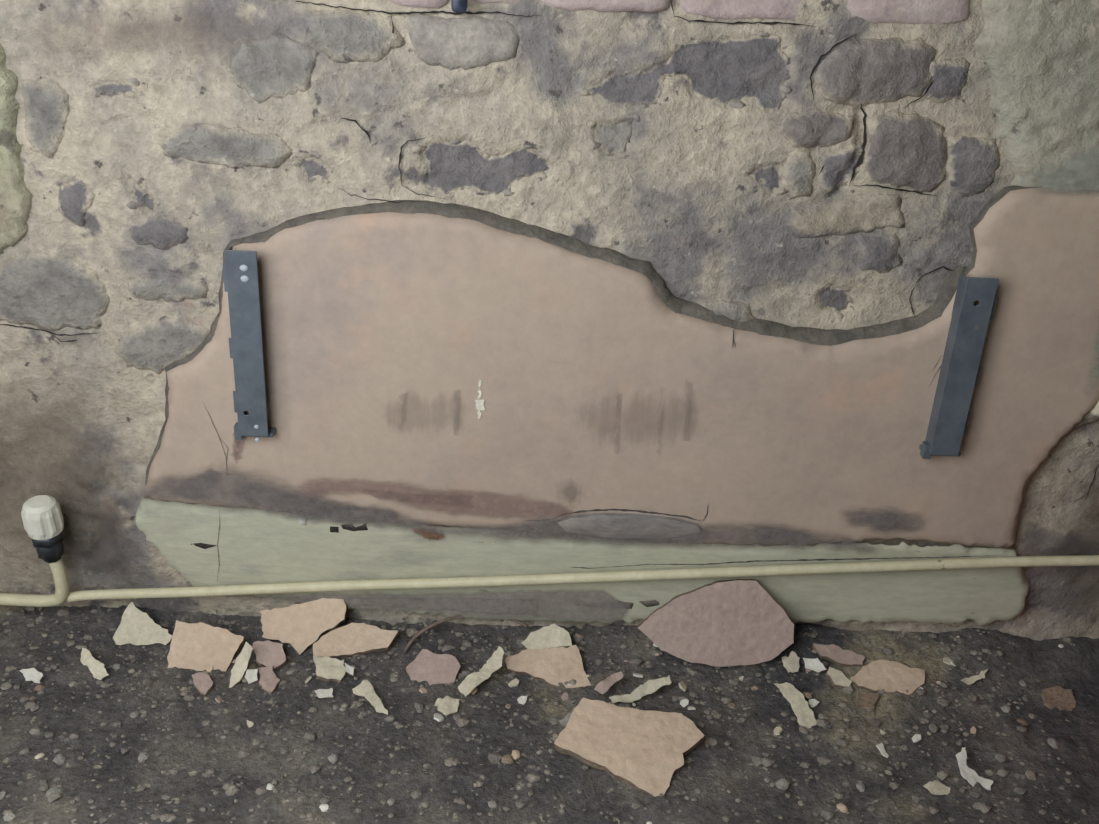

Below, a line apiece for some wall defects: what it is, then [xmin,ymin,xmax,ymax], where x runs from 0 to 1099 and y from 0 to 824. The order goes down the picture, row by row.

flaking render [229,9,519,104]
flaking render [21,77,70,159]
flaking render [57,178,96,227]
flaking render [116,174,189,250]
flaking render [159,123,333,184]
spalling [411,138,549,200]
spalling [579,31,1000,274]
flaking render [114,275,210,375]
damp [0,407,125,576]
damp [137,471,869,550]
damp [848,511,918,530]
damp [1051,490,1099,598]